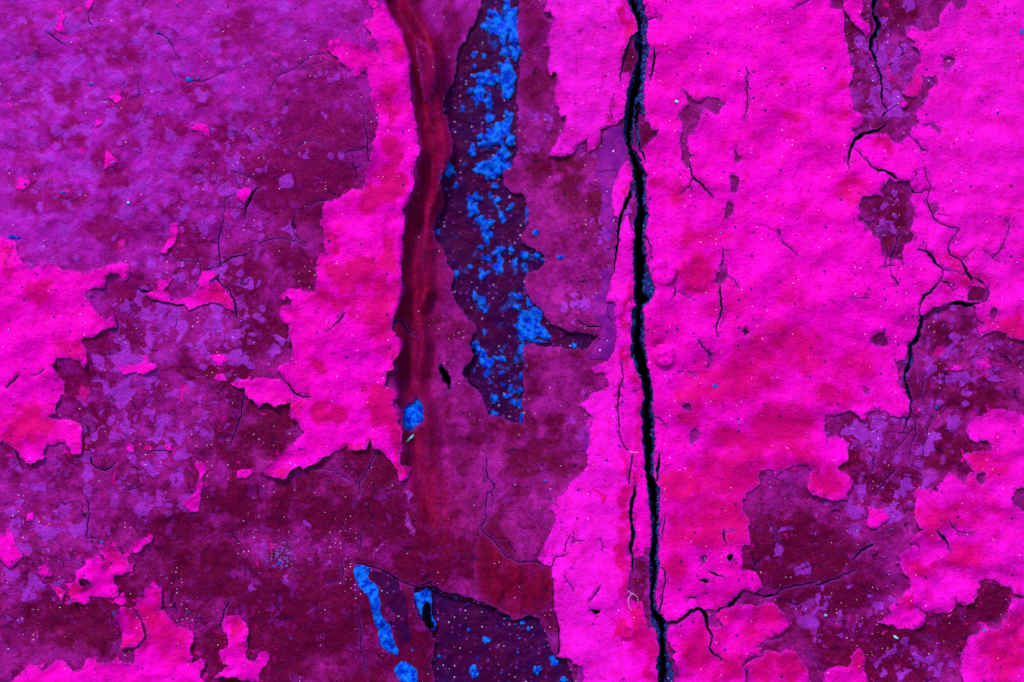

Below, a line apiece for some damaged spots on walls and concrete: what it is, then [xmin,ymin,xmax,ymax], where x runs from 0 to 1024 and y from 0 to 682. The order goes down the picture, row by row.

peeling [831,0,966,143]
peeling [0,237,131,465]
peeling [145,269,235,311]
peeling [210,0,420,481]
damp [402,398,424,431]
crack [577,0,873,682]
peeling [858,179,915,260]
crack [847,0,988,496]
peeling [182,461,208,512]
peeling [11,536,270,682]
peeling [473,531,554,620]
peeling [666,596,868,682]